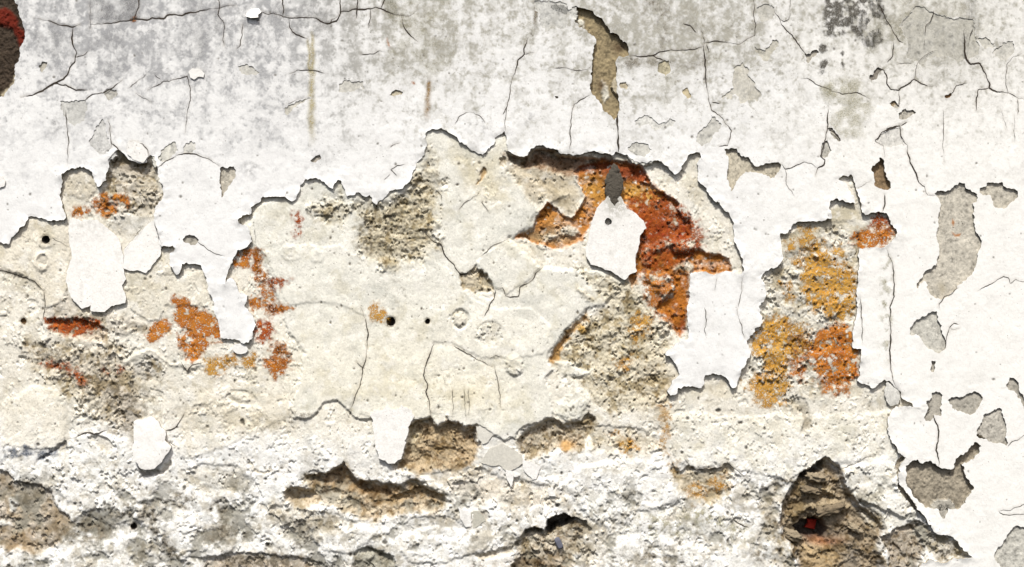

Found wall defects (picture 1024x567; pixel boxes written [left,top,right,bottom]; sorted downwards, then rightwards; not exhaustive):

spalling [0,0,25,97]
crack [109,123,213,166]
crack [23,0,418,154]
crack [456,42,531,130]
crack [613,115,621,154]
crack [632,0,935,196]
crack [942,29,1023,151]
spalling [0,115,900,528]
spalling [910,182,1017,372]
spalling [510,513,592,567]
spalling [778,456,926,567]
spalling [898,391,1007,519]